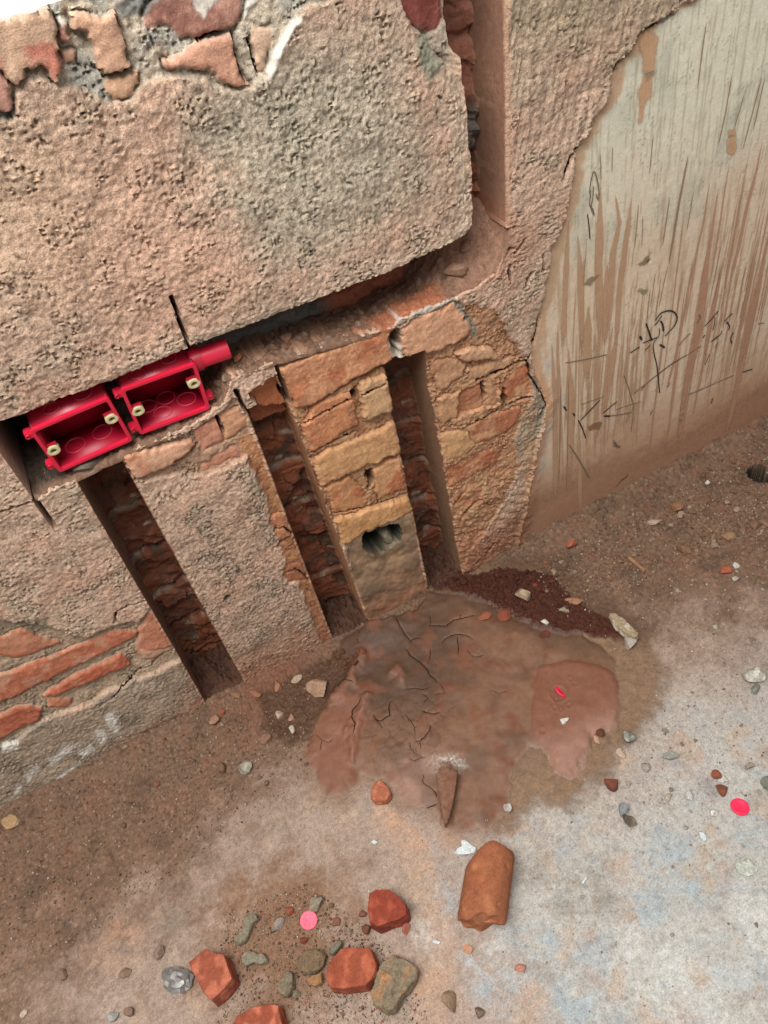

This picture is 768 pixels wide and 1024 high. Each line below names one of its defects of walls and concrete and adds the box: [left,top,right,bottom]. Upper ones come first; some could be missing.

spalling [0,0,333,124]
spalling [401,0,460,74]
damp [718,76,765,148]
damp [646,158,694,323]
spalling [122,300,547,643]
spalling [0,607,181,747]